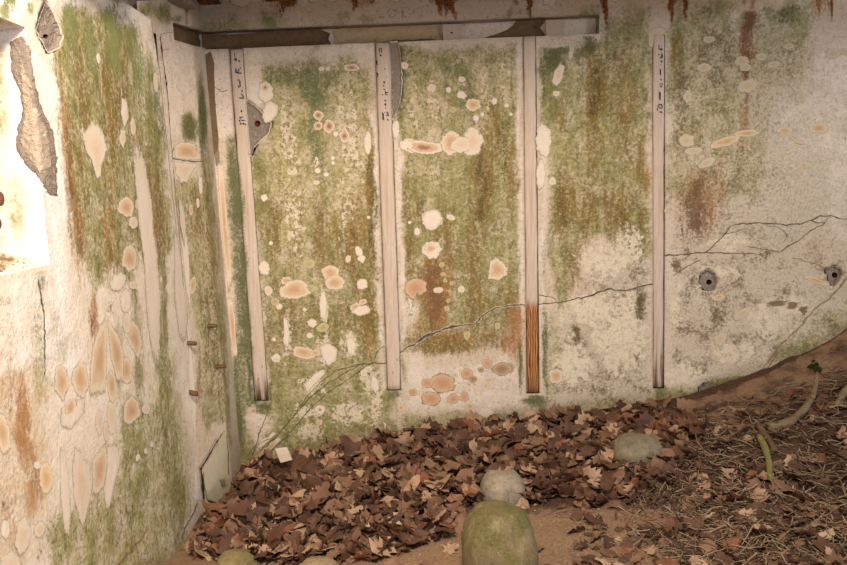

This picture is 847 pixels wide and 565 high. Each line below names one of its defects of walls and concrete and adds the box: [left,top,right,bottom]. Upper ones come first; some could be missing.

spalling [10,36,58,196]
peeling [389,41,485,156]
rust [432,0,457,18]
damp [539,36,597,104]
rust [667,0,688,21]
rust [738,0,757,60]
peeling [54,98,161,429]
damp [367,162,381,280]
damp [627,295,646,320]
crack [665,215,847,369]
crack [253,284,652,456]
crack [181,431,229,539]